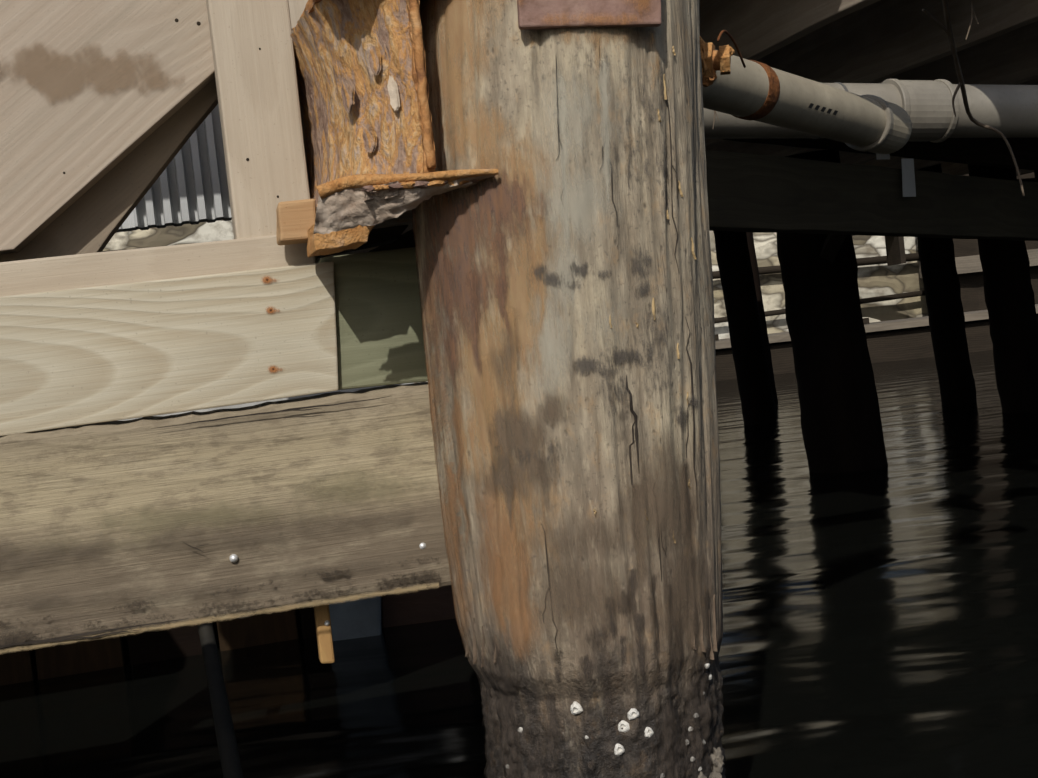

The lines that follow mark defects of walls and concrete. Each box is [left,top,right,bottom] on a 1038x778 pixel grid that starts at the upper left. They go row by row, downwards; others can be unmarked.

damp [16,47,163,98]
damp [534,62,616,295]
damp [492,398,562,522]
damp [576,311,669,412]
damp [677,396,698,427]
damp [87,570,357,631]
damp [375,558,440,588]
damp [477,644,559,778]